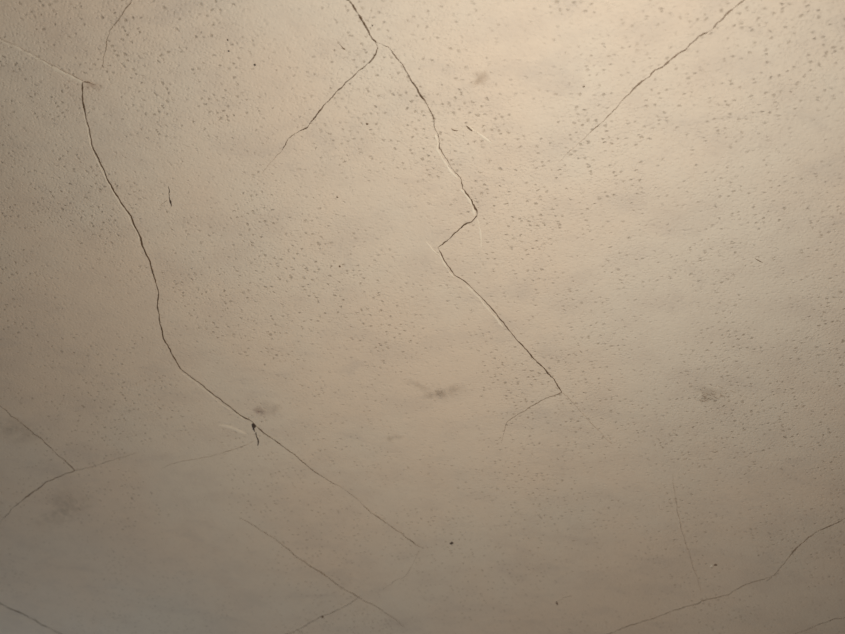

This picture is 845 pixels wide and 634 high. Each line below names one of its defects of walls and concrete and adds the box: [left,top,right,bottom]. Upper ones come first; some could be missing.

crack [0,0,418,546]
crack [261,0,608,441]
crack [557,0,744,164]
crack [609,486,845,634]